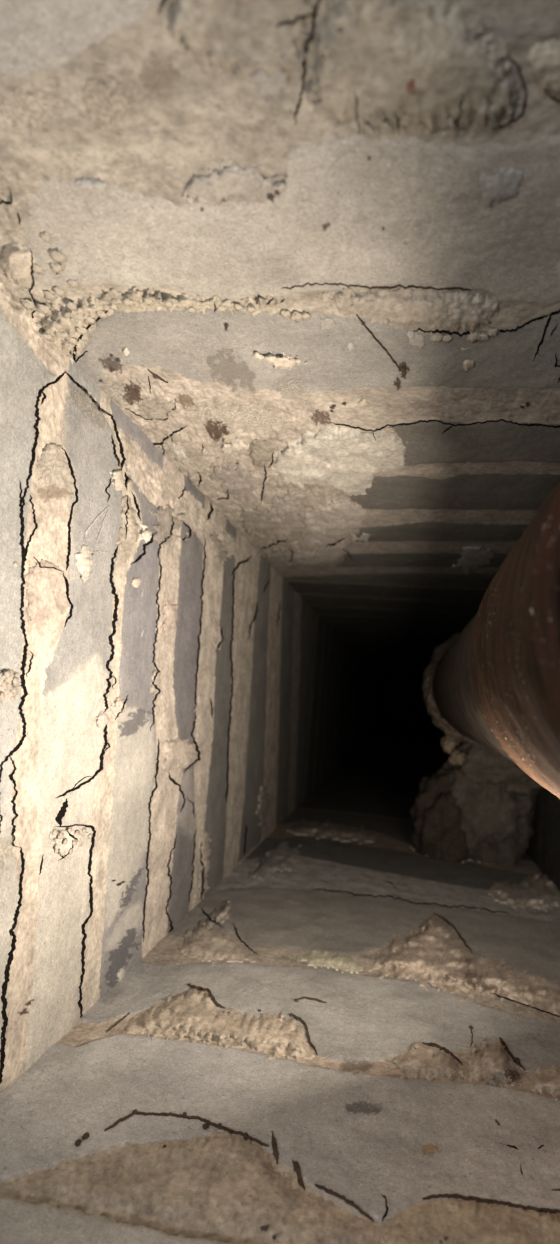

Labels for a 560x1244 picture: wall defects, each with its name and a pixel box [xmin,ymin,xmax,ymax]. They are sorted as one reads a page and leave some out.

crack [275,0,320,125]
crack [0,311,294,1084]
crack [381,1195,389,1223]